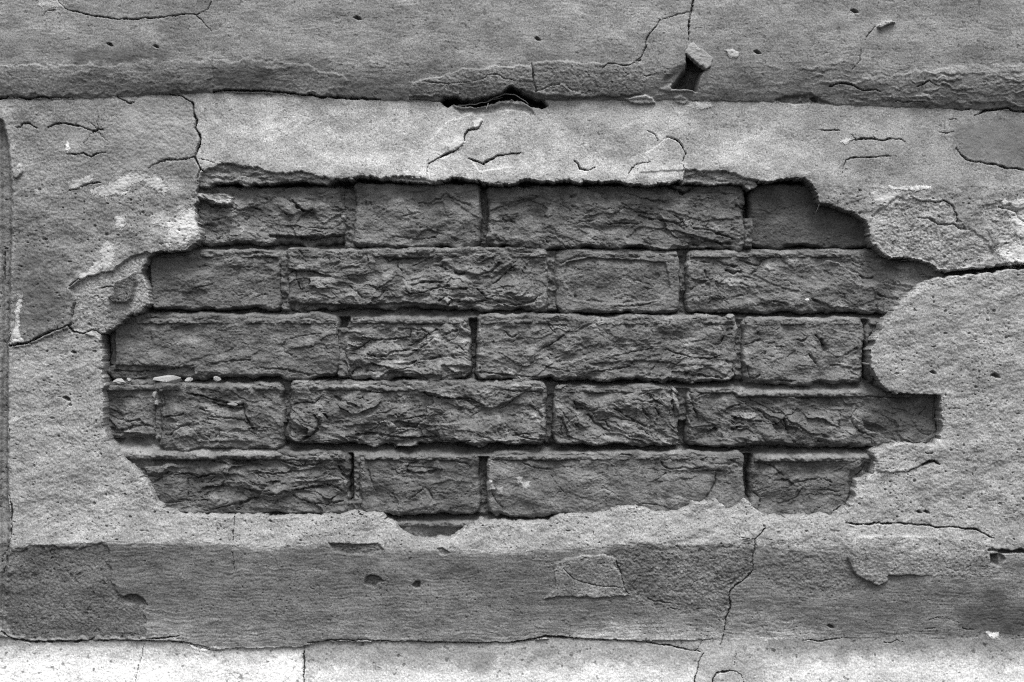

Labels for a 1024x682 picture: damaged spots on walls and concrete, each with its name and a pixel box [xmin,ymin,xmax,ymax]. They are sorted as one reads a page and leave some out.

crack [607,0,694,64]
spalling [685,43,713,71]
crack [829,31,935,103]
crack [0,96,106,157]
crack [150,89,380,183]
crack [427,121,519,167]
crack [821,129,903,173]
crack [940,107,1024,171]
crack [10,280,88,347]
spalling [70,161,1017,555]
crack [849,522,1024,553]